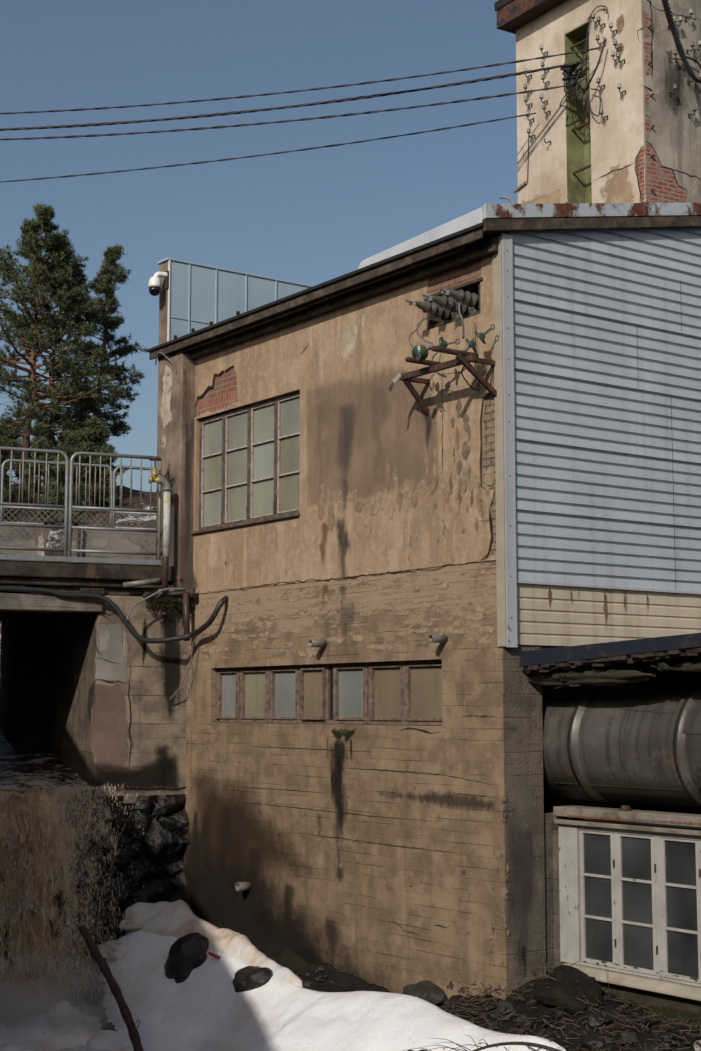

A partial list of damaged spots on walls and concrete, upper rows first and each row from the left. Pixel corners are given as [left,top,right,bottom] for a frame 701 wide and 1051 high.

spalling [635,12,687,203]
spalling [160,354,248,449]
peeling [187,384,510,660]
water stain [308,372,436,501]
water stain [327,739,352,828]
water stain [183,781,367,983]